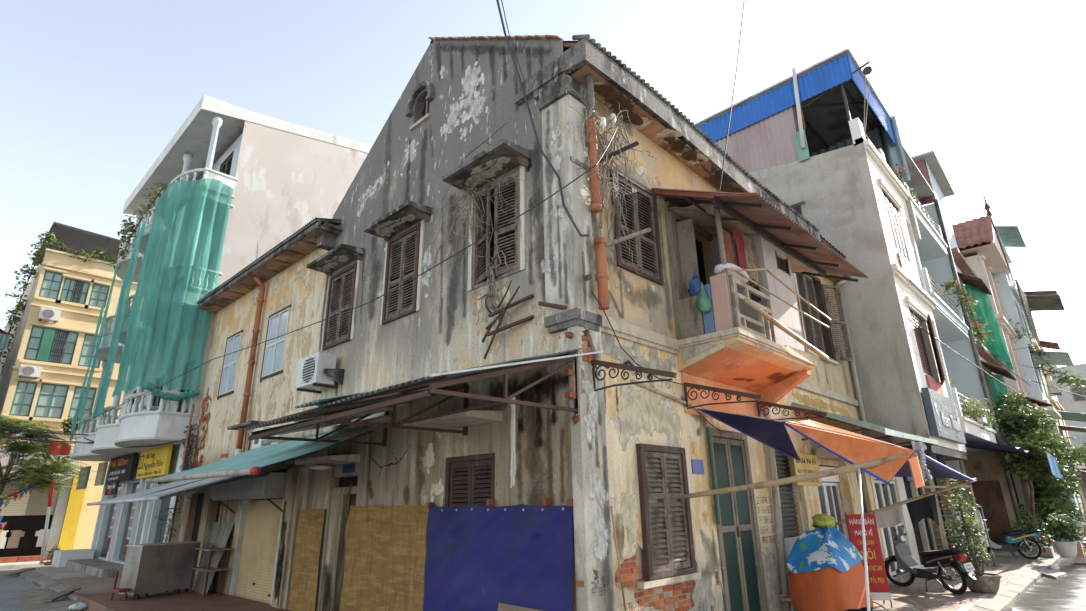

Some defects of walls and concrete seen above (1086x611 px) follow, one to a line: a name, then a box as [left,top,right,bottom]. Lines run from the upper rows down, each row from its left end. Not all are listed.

flaking render [440,61,488,141]
flaking render [531,304,722,611]